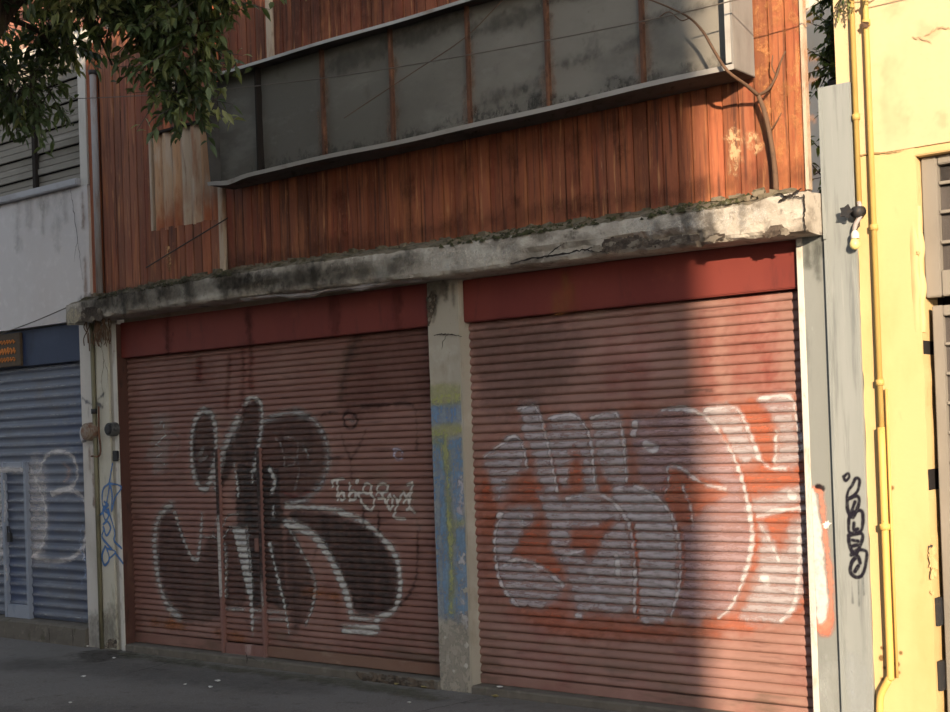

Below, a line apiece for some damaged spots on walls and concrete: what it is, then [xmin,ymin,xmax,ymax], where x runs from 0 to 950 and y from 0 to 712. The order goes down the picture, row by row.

leakage [471,77,635,132]
peeling [727,130,760,171]
crack [773,188,806,232]
crack [510,243,609,265]
spalling [602,233,725,253]
spalling [763,224,790,238]